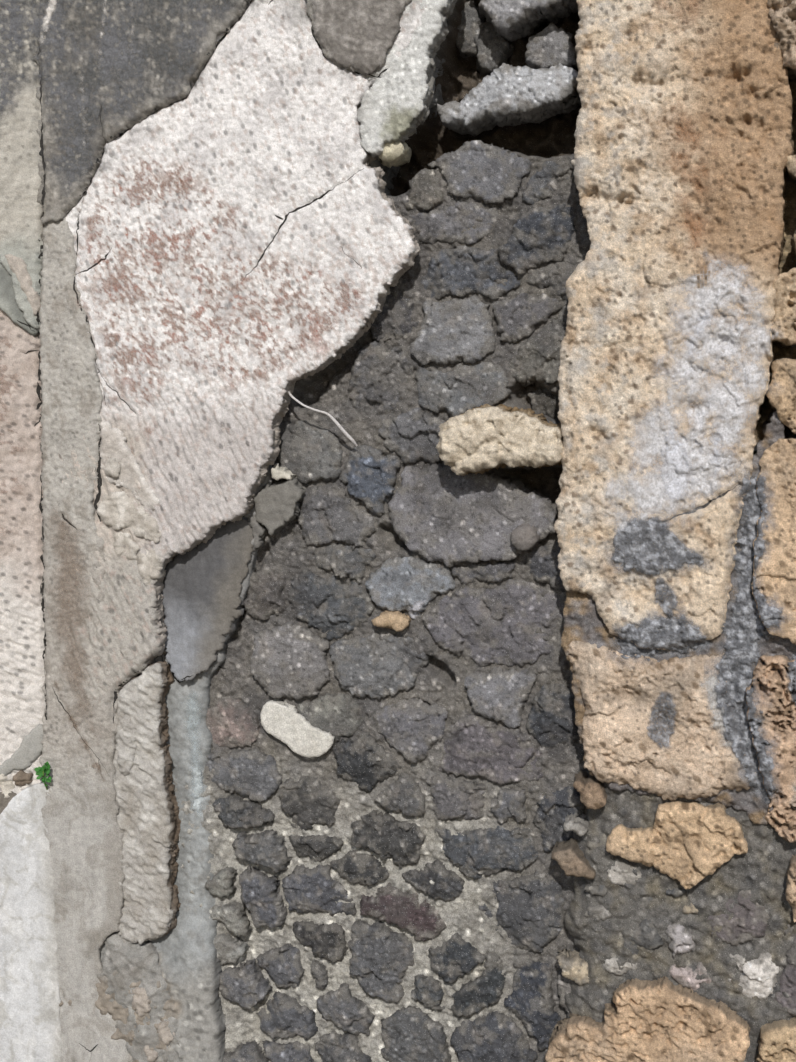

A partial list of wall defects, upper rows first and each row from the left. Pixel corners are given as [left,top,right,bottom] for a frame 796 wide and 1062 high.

crack [17,0,273,778]
crack [243,168,364,280]
peeling [97,420,307,1062]